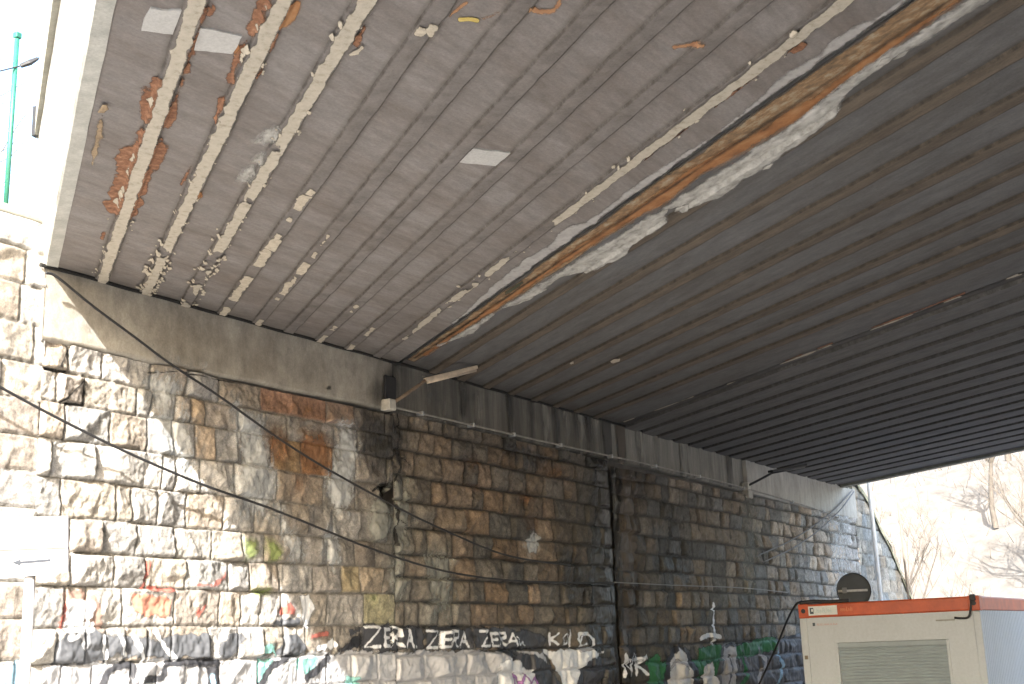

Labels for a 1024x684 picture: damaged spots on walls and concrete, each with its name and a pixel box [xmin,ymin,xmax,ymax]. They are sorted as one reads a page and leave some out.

peeling [91,0,206,284]
corrosion [102,5,216,220]
peeling [136,0,292,296]
corrosion [213,97,225,124]
corrosion [226,0,272,85]
corrosion [256,1,301,79]
peeling [180,0,377,316]
peeling [414,24,438,38]
peeling [394,247,530,346]
corrosion [408,0,959,362]
peeling [550,0,855,232]
leakage [437,0,990,347]